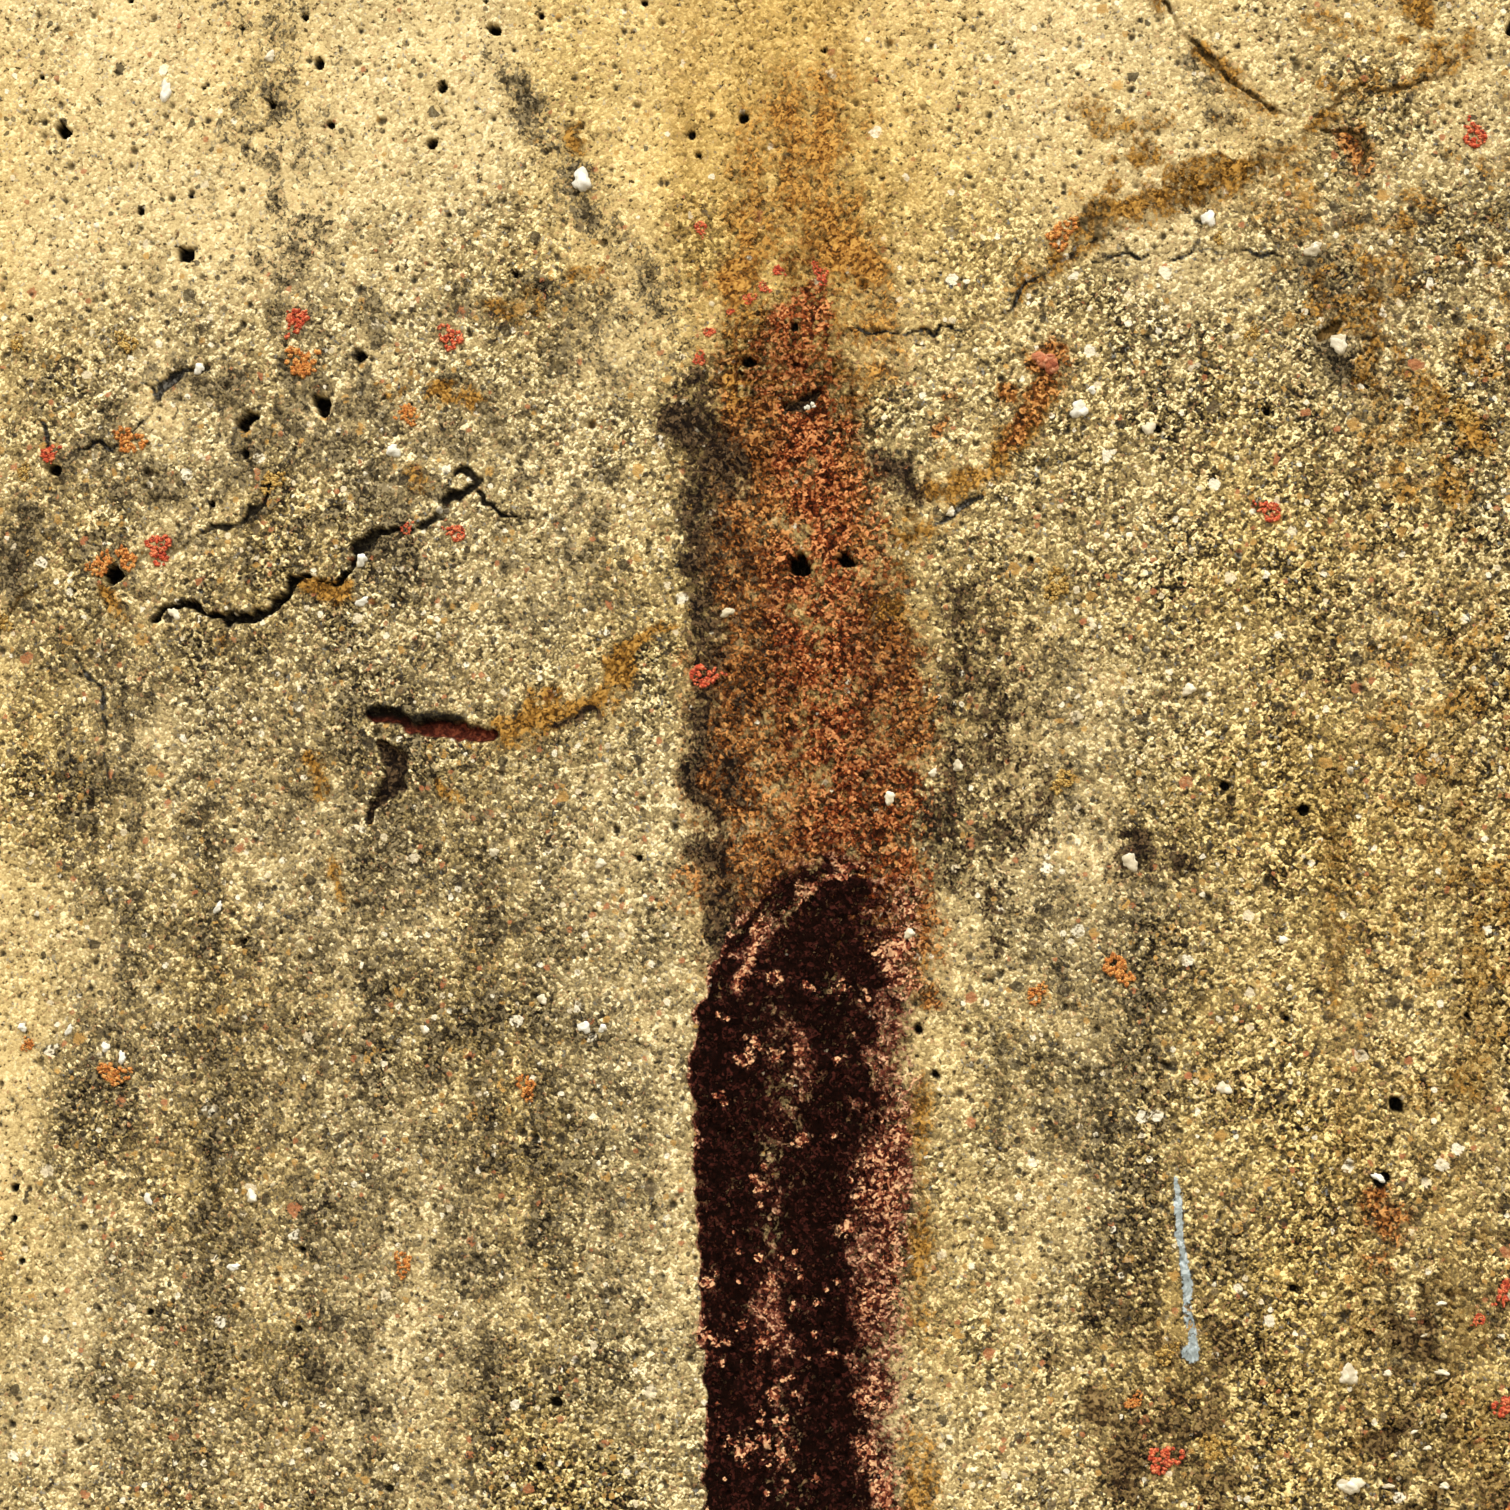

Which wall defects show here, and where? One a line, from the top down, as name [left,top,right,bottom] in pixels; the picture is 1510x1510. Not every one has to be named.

crack [1162,0,1433,165]
crack [850,224,1278,338]
crack [26,366,208,466]
crack [153,466,534,628]
leakage [0,0,694,1510]
rust [467,0,1077,1510]